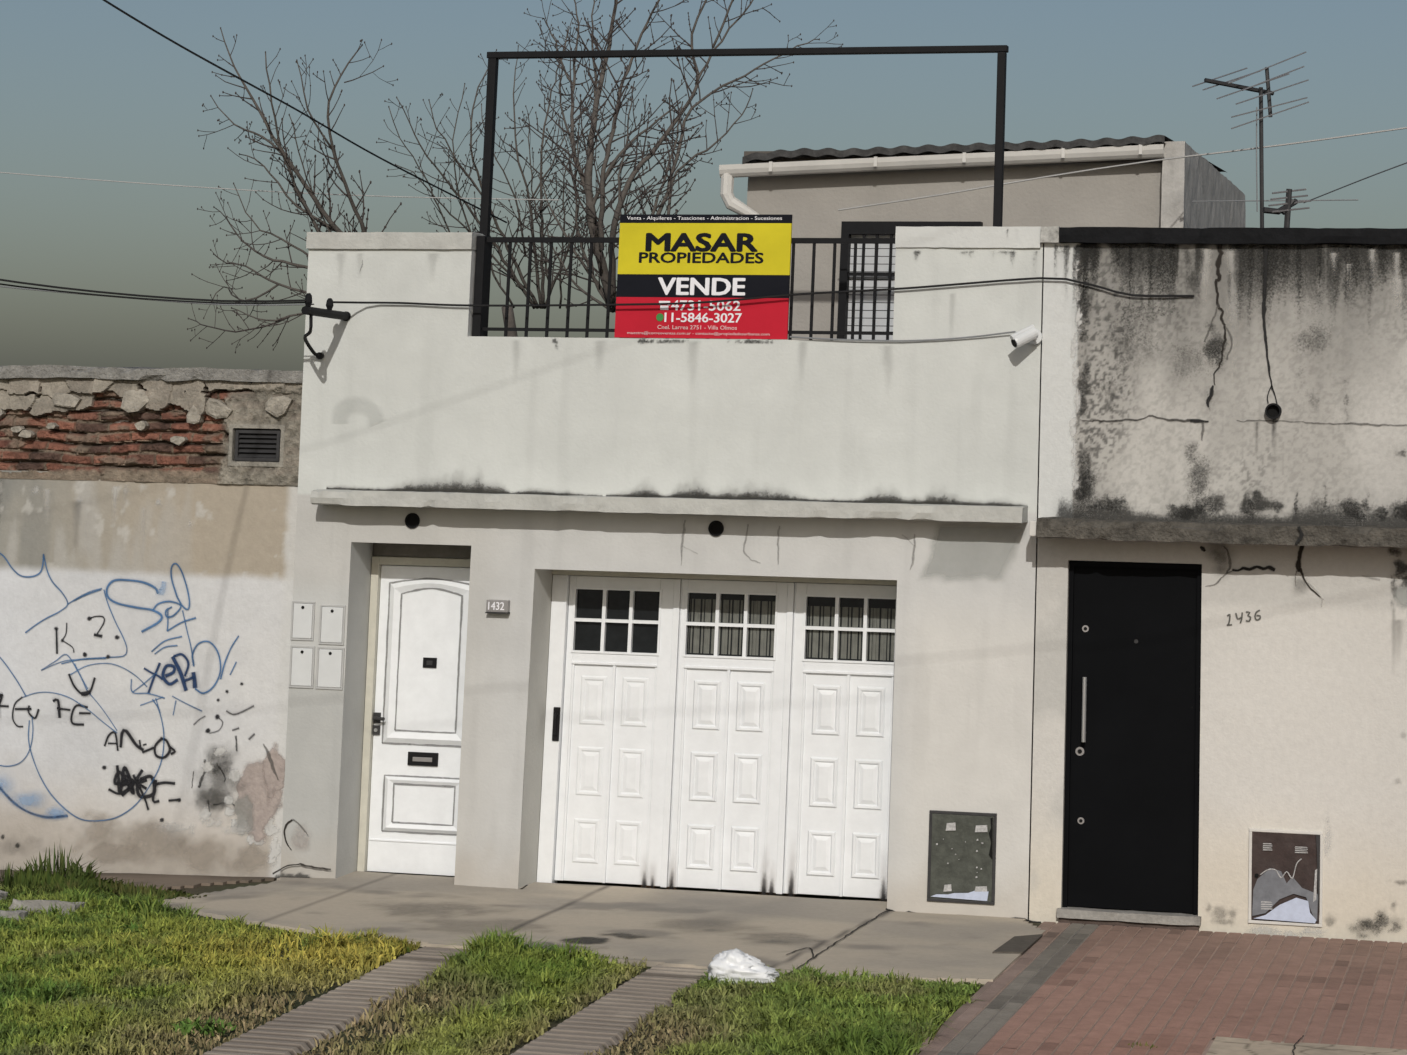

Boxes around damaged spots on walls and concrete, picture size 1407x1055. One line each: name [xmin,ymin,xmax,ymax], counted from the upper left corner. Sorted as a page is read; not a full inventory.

damp [1055,243,1407,429]
crack [1080,244,1406,438]
crack [1205,526,1323,602]
peeling [225,744,331,880]